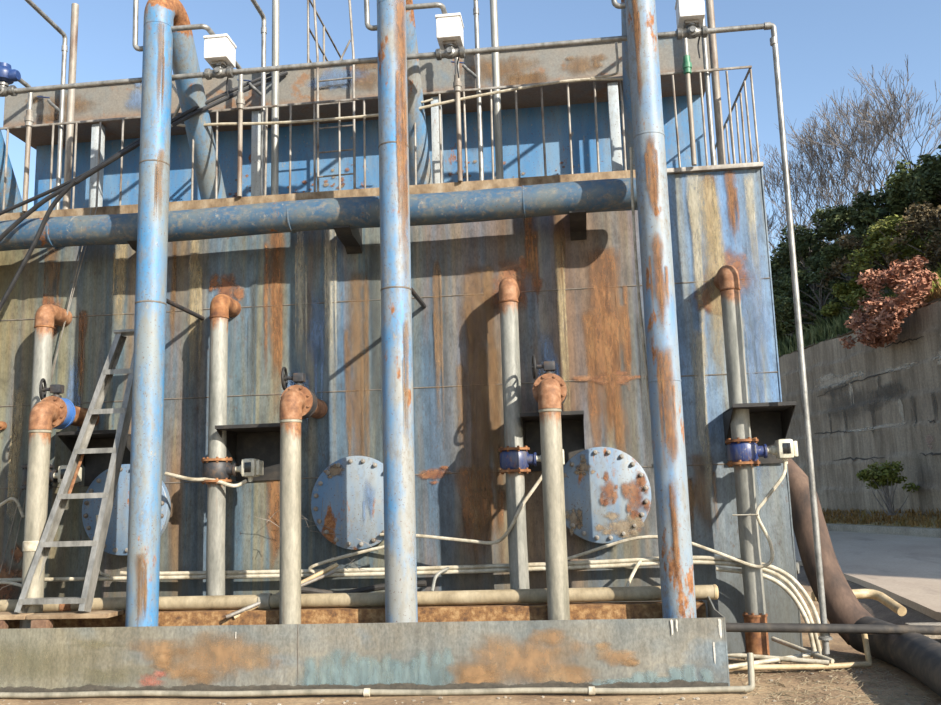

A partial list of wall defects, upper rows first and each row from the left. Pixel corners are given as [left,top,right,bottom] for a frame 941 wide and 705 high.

rust [645,140,658,209]
rust [705,171,739,228]
rust [264,233,283,370]
rust [649,235,669,311]
rust [420,217,542,540]
rust [574,249,644,442]
rust [656,348,677,457]
rust [267,480,280,555]
rust [669,485,680,574]
rust [688,456,717,522]
rust [141,639,264,683]
rust [457,631,586,684]